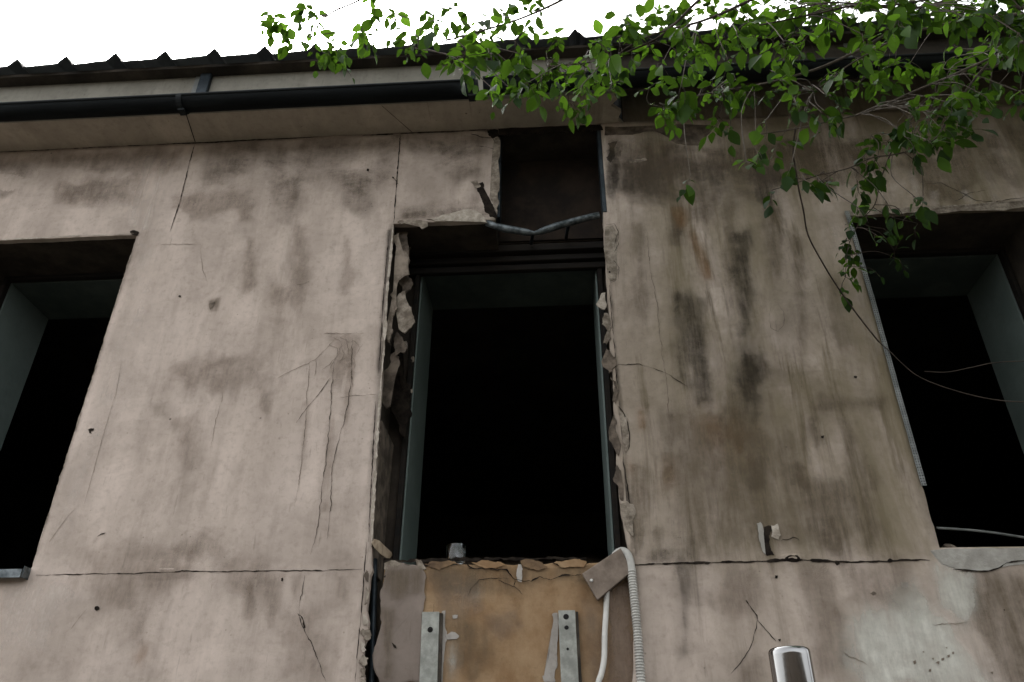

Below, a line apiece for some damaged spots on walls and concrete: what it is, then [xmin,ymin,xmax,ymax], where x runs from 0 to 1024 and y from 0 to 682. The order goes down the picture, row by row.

flaking render [382,137,501,439]
leakage [734,234,750,330]
crack [7,105,587,681]
spalling [596,292,636,536]
crack [635,537,926,565]
flaking render [359,559,587,682]
crack [733,600,775,671]